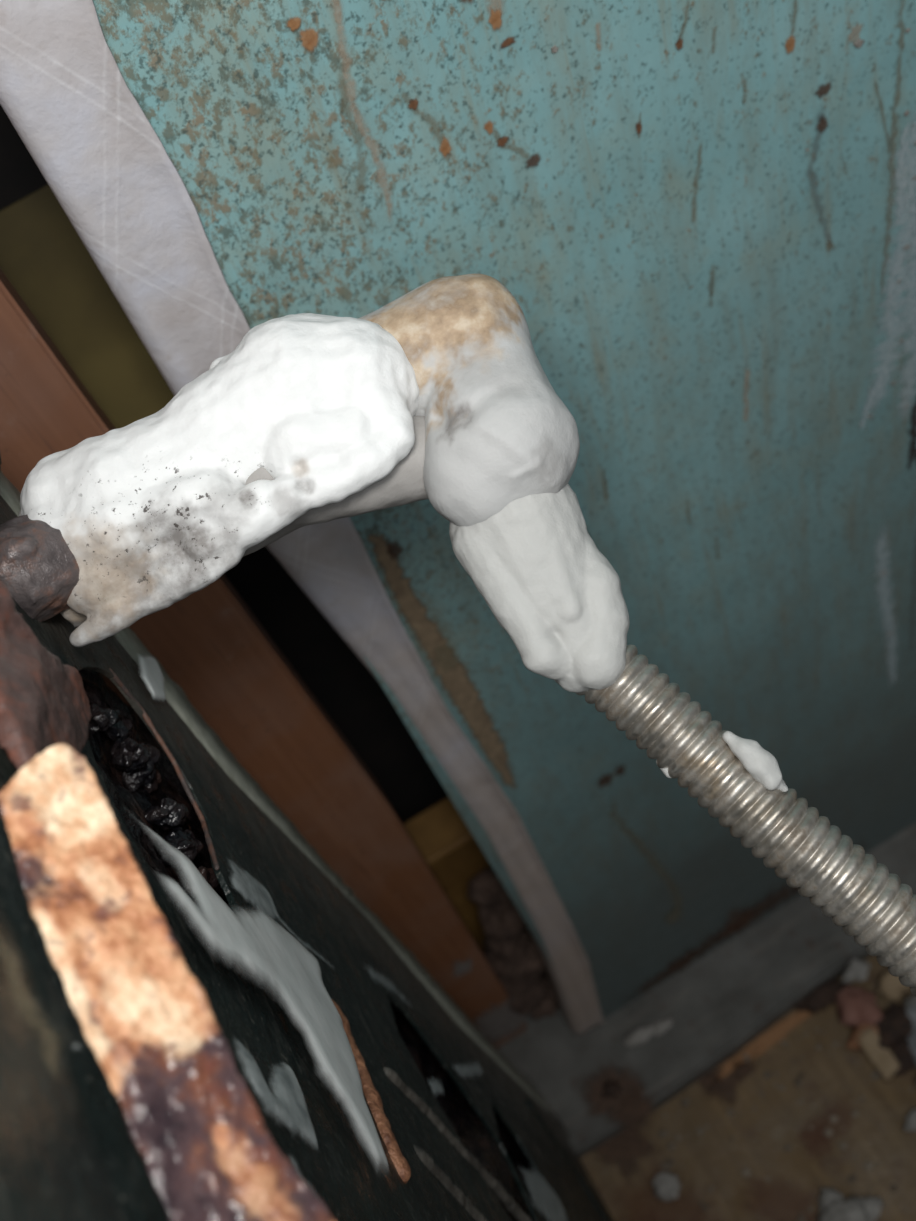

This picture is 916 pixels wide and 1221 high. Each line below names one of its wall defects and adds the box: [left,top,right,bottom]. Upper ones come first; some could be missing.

corrosion [287,17,318,51]
corrosion [489,0,515,48]
corrosion [786,36,795,53]
corrosion [484,121,508,146]
corrosion [440,137,451,157]
corrosion [526,154,540,167]